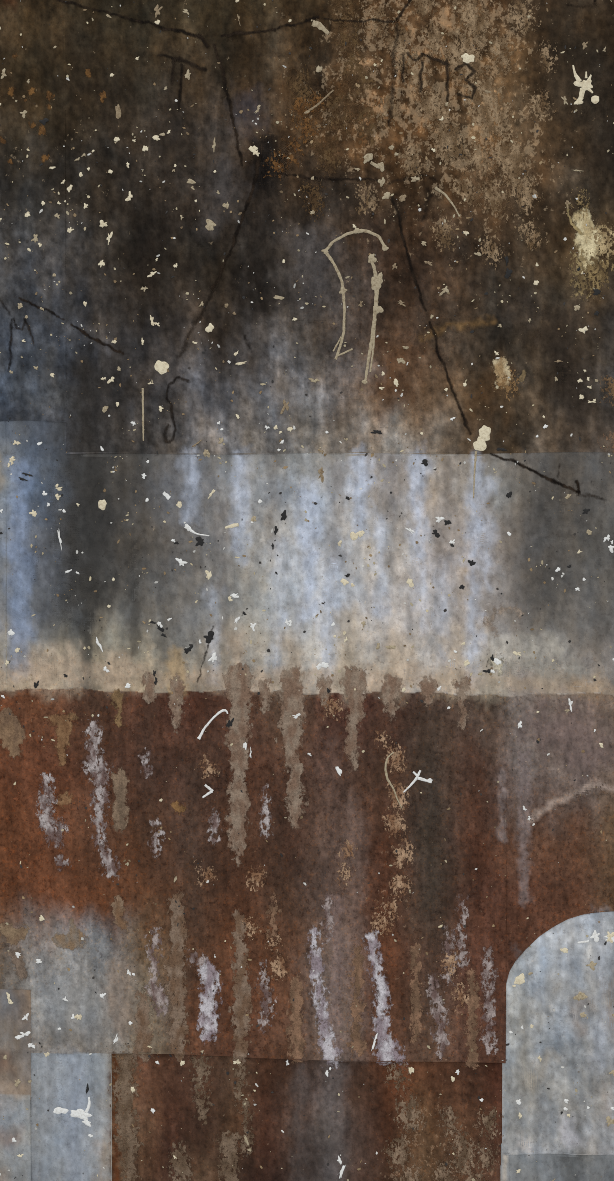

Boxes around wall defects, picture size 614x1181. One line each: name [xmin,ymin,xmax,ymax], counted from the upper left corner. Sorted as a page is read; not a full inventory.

crack [2,297,124,355]
water stain [0,319,181,666]
water stain [190,77,354,326]
crack [56,0,602,499]
water stain [316,340,389,405]
water stain [76,672,116,784]
water stain [126,437,614,1181]
water stain [26,1039,96,1181]